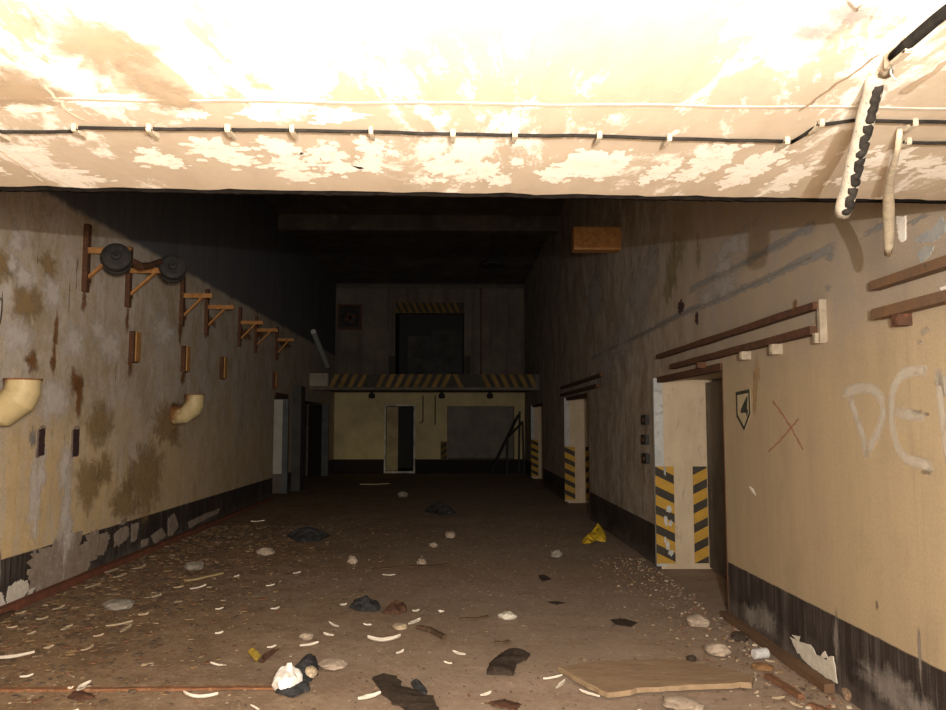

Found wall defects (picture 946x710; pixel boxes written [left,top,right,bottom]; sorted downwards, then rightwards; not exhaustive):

peeling [133,106,403,184]
peeling [410,148,634,188]
peeling [634,138,842,193]
peeling [861,145,946,181]
water stain [0,227,62,351]
water stain [66,319,120,364]
water stain [41,381,69,421]
water stain [27,452,46,539]
water stain [57,404,112,564]
water stain [114,404,178,517]
peeling [0,508,220,606]
spalling [790,635,838,683]